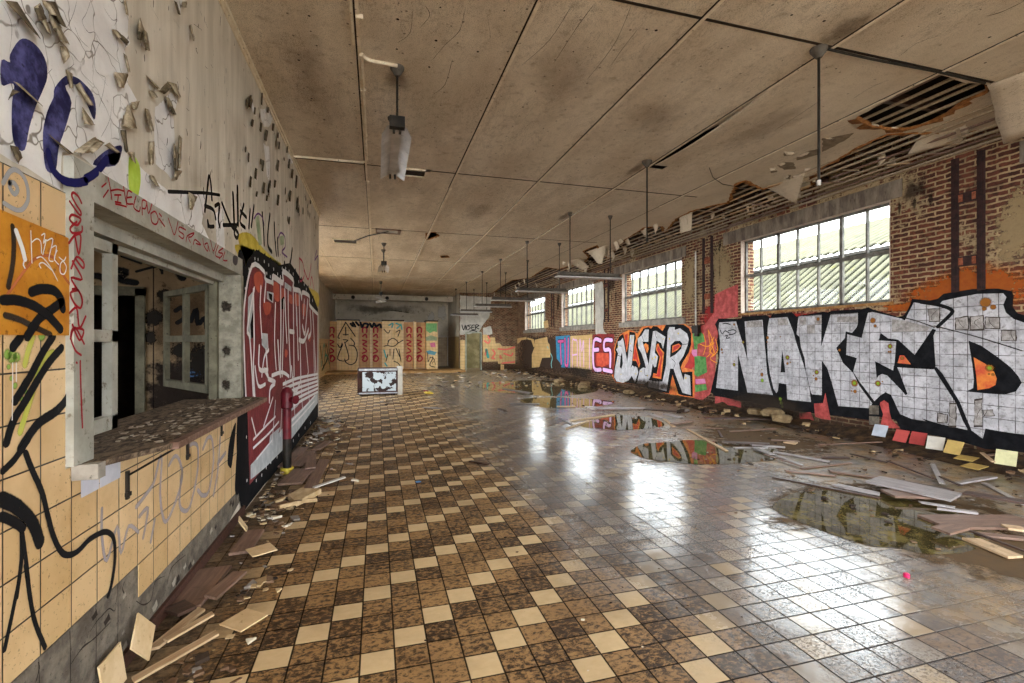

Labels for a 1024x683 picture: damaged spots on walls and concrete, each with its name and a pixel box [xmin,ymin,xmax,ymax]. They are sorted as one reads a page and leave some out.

crack [49,2,120,137]
peeling [0,0,225,248]
peeling [245,93,311,225]
peeling [769,133,853,180]
peeling [518,335,575,375]